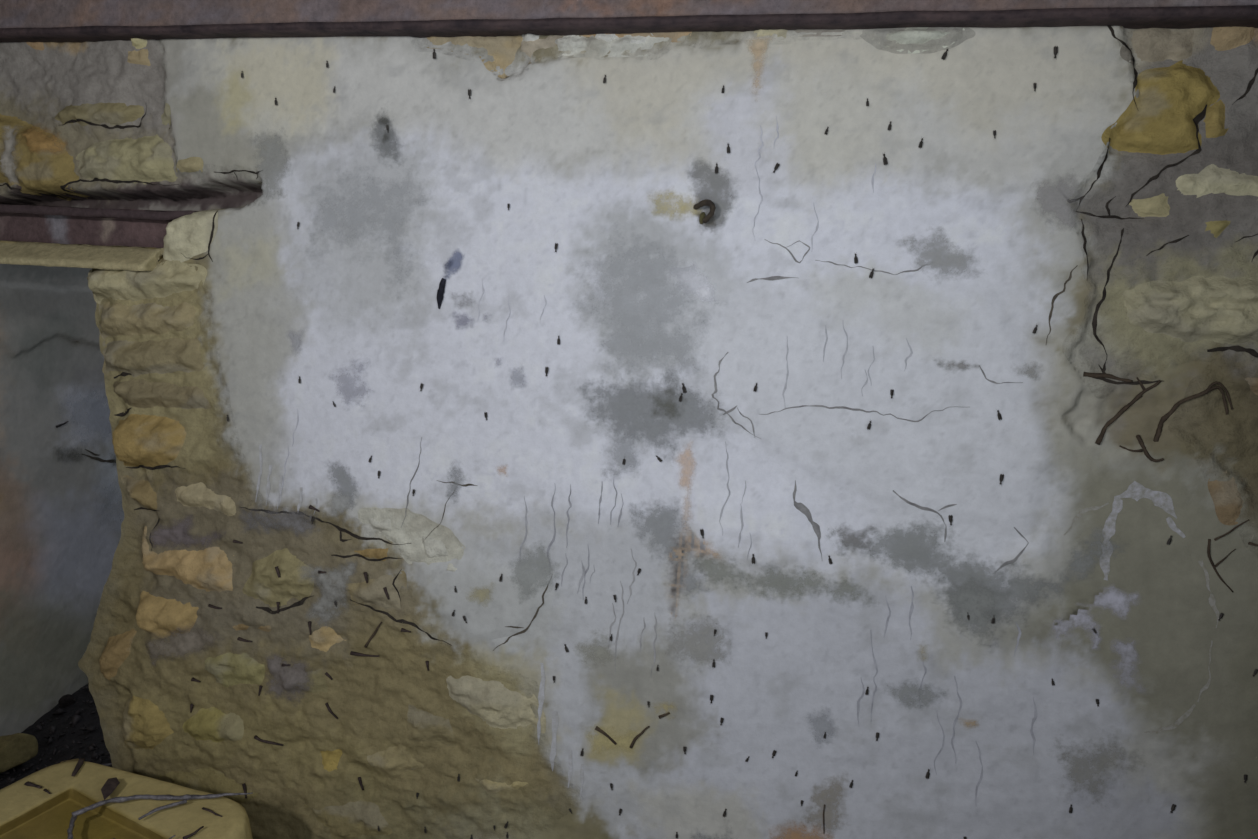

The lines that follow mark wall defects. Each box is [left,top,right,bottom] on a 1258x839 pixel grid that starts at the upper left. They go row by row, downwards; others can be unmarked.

damp [656,163,733,226]
crack [747,239,928,283]
damp [904,237,971,273]
crack [1046,68,1258,385]
flaking render [1062,26,1258,557]
flaking render [0,38,583,839]
crack [240,438,477,646]
damp [583,376,861,598]
crack [793,480,822,557]
crack [711,352,948,439]
damp [841,526,1114,656]
damp [1054,589,1137,648]